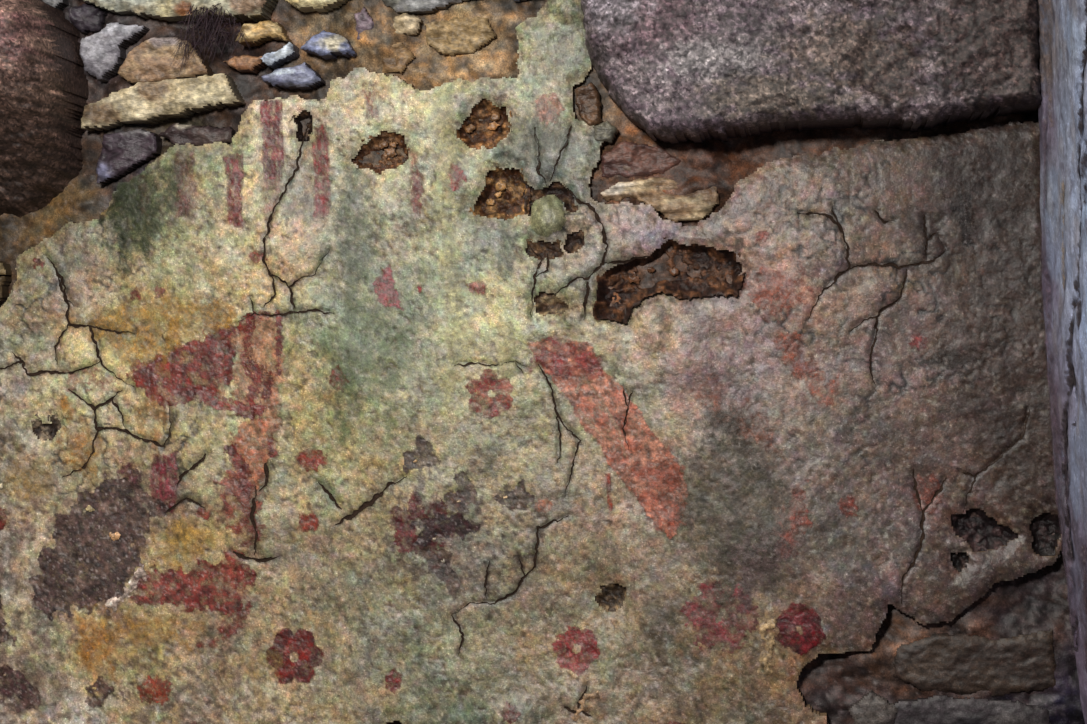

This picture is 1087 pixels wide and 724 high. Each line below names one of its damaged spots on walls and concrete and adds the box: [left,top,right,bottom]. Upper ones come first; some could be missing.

crack [238,119,332,322]
spalling [353,131,410,175]
spalling [453,99,513,150]
spalling [469,163,578,221]
spalling [534,292,569,316]
spalling [526,230,584,260]
spalling [593,237,746,323]
crack [797,210,945,387]
crack [0,258,171,477]
crack [166,453,206,513]
crack [451,361,581,655]
spalling [946,427,1072,572]